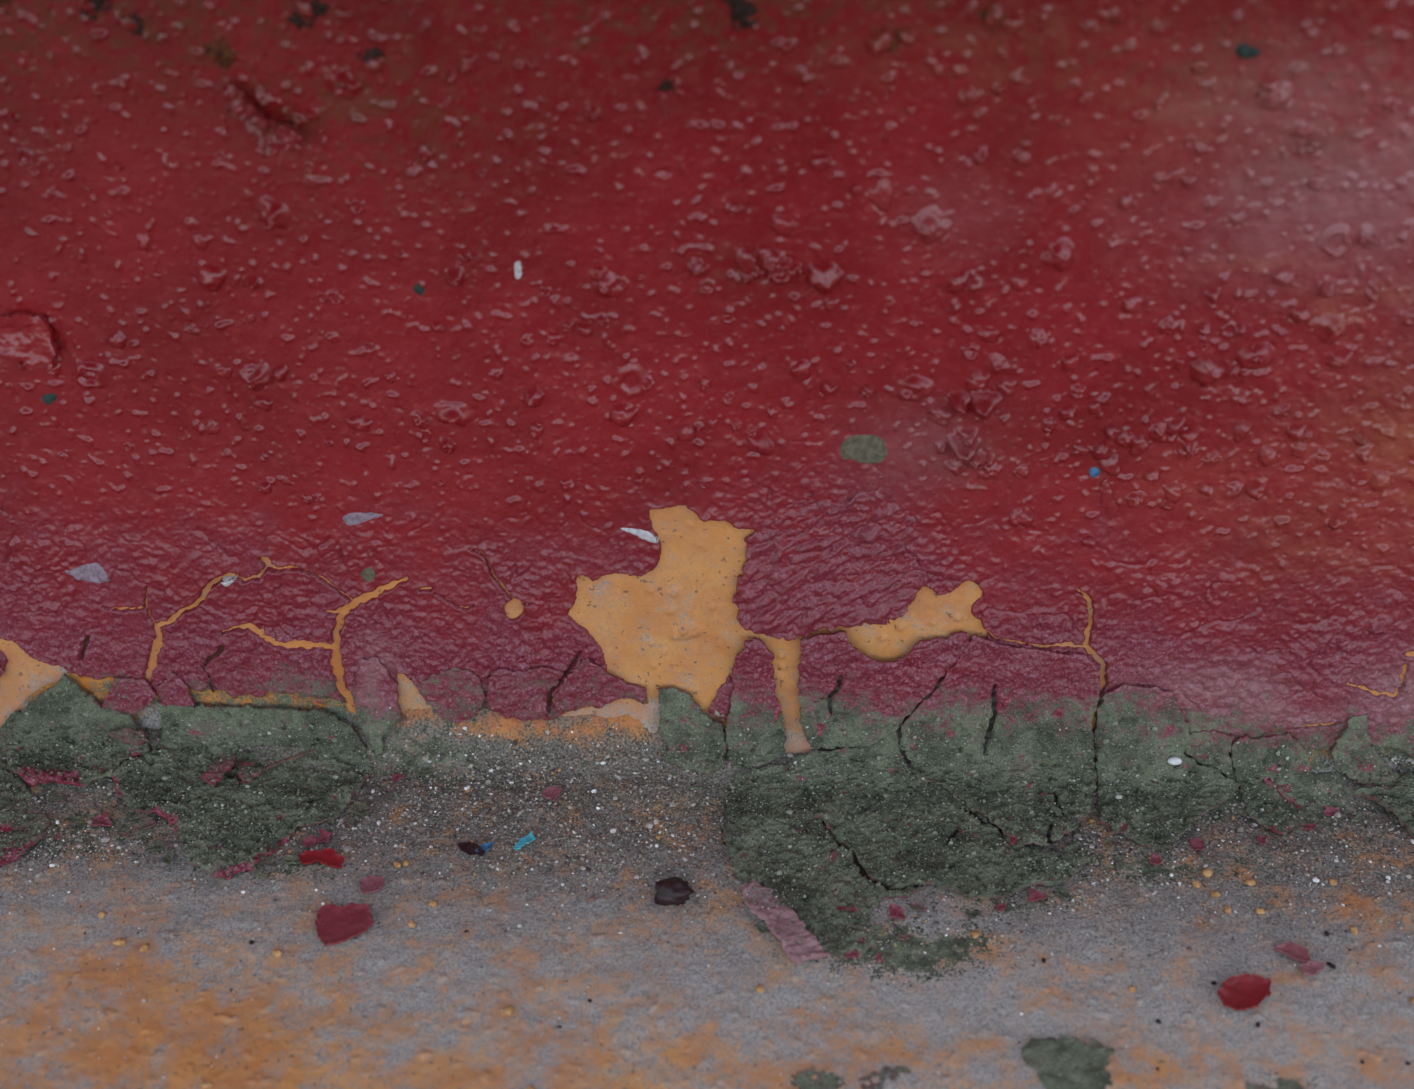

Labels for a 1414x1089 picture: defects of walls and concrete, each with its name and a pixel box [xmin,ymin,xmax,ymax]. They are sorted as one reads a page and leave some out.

crack [82,635,90,656]
crack [114,565,470,714]
crack [820,676,842,714]
crack [967,588,1106,764]
crack [1346,651,1414,697]
peeling [0,490,1313,960]
crack [897,676,944,784]
peeling [1331,714,1414,840]
crack [947,808,1003,844]
crack [1046,793,1064,844]
peeling [1274,941,1326,976]